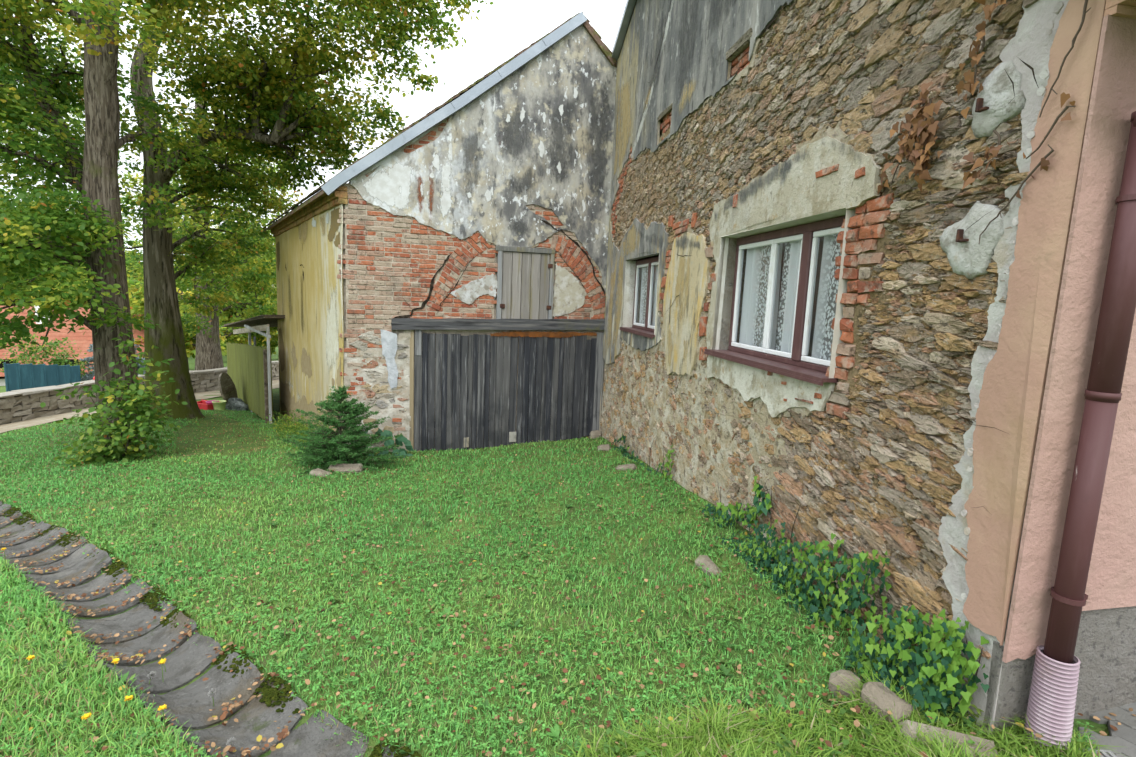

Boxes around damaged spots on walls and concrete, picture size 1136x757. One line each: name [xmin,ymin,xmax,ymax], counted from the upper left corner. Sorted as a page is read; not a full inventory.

leakage [463,134,481,193]
peeling [484,93,546,123]
leakage [506,112,531,156]
leakage [509,169,533,192]
peeling [538,140,576,175]
leakage [550,0,736,193]
flaking render [279,117,498,452]
crack [391,253,475,325]
flaking render [524,195,606,319]
flaking render [600,0,1069,739]